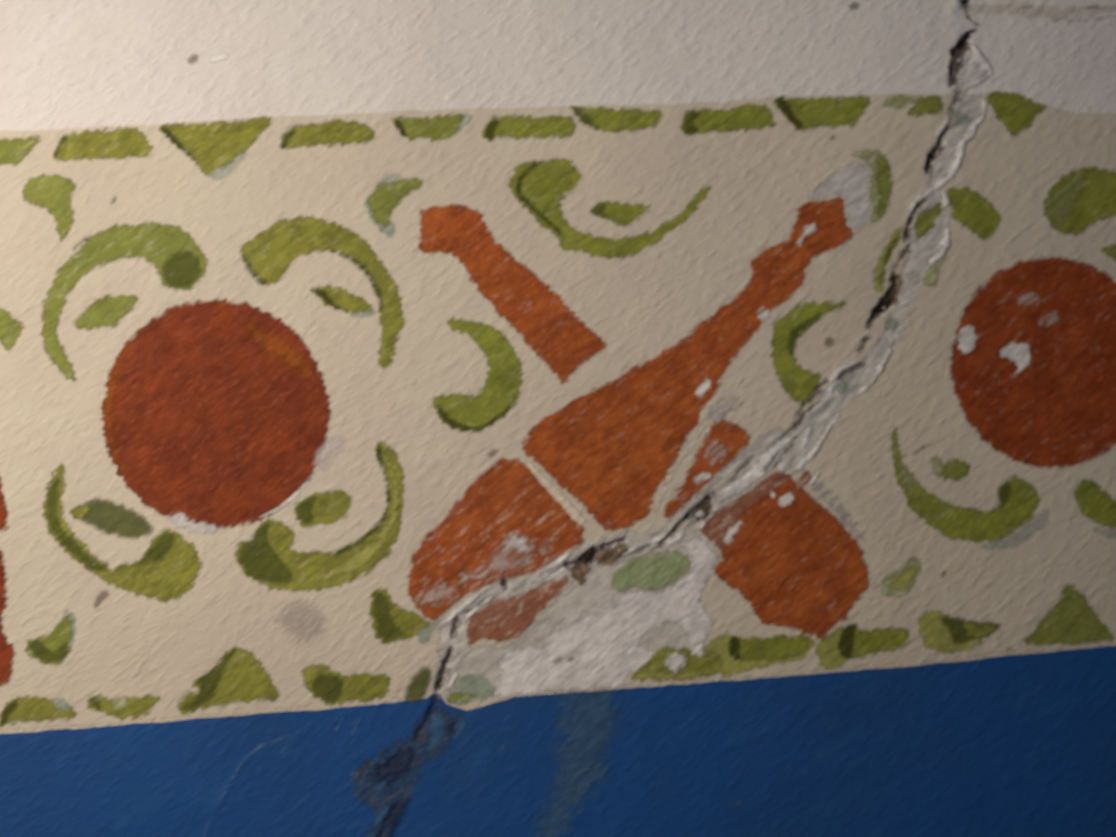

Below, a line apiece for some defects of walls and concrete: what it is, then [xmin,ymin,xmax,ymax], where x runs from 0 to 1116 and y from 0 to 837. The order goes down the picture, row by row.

crack [432,0,993,698]
peeling [957,325,979,354]
peeling [1000,341,1031,373]
peeling [414,532,551,607]
spalling [450,520,742,701]